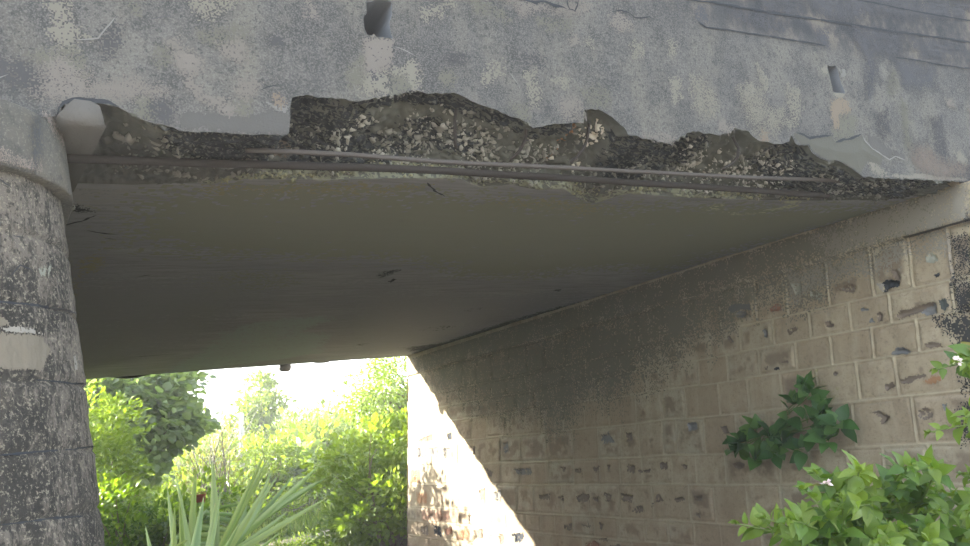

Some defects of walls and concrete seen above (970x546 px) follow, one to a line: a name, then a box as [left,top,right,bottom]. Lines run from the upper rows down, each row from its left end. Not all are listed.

spalling [78,90,967,204]
damp [65,0,970,449]
spalling [0,317,51,372]